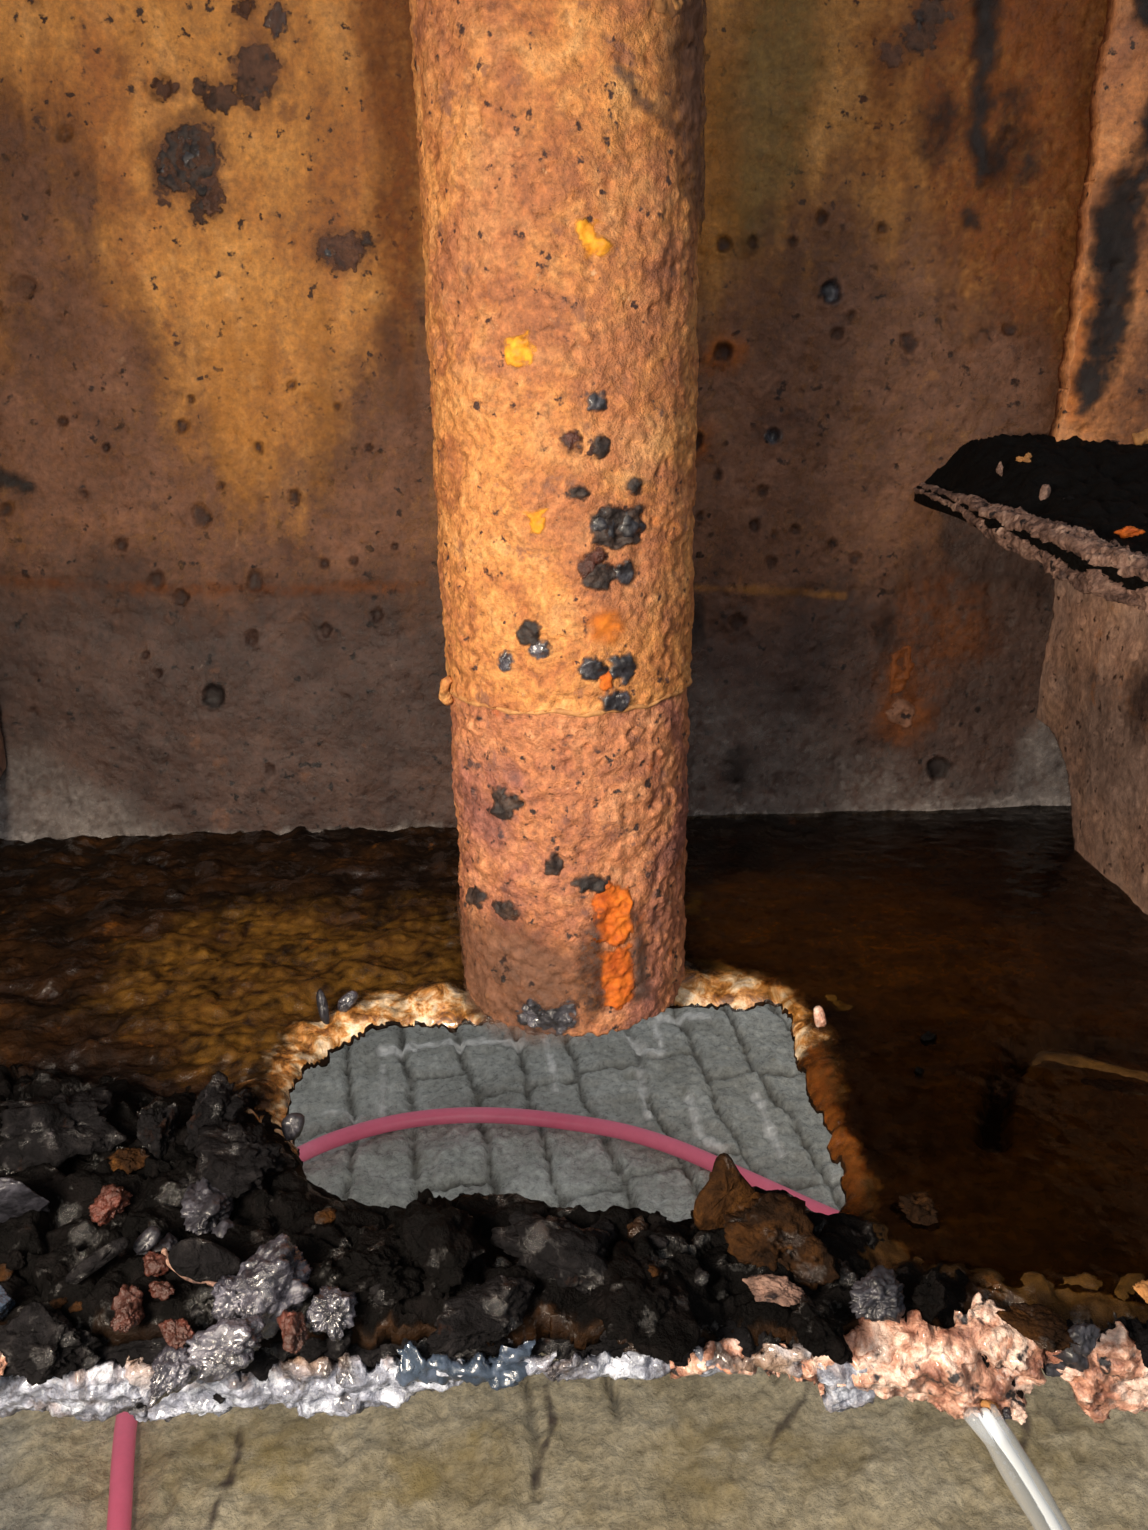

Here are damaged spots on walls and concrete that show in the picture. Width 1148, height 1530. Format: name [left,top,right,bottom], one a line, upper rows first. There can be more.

corrosion [560,430,611,460]
leakage [666,0,1148,821]
corrosion [568,477,646,590]
corrosion [498,620,551,672]
corrosion [578,613,636,712]
corrosion [490,786,524,820]
corrosion [465,886,519,921]
corrosion [544,853,611,894]
leakage [632,916,649,1001]
leakage [625,1012,711,1120]
leakage [684,830,1148,1305]
crack [532,1385,556,1485]